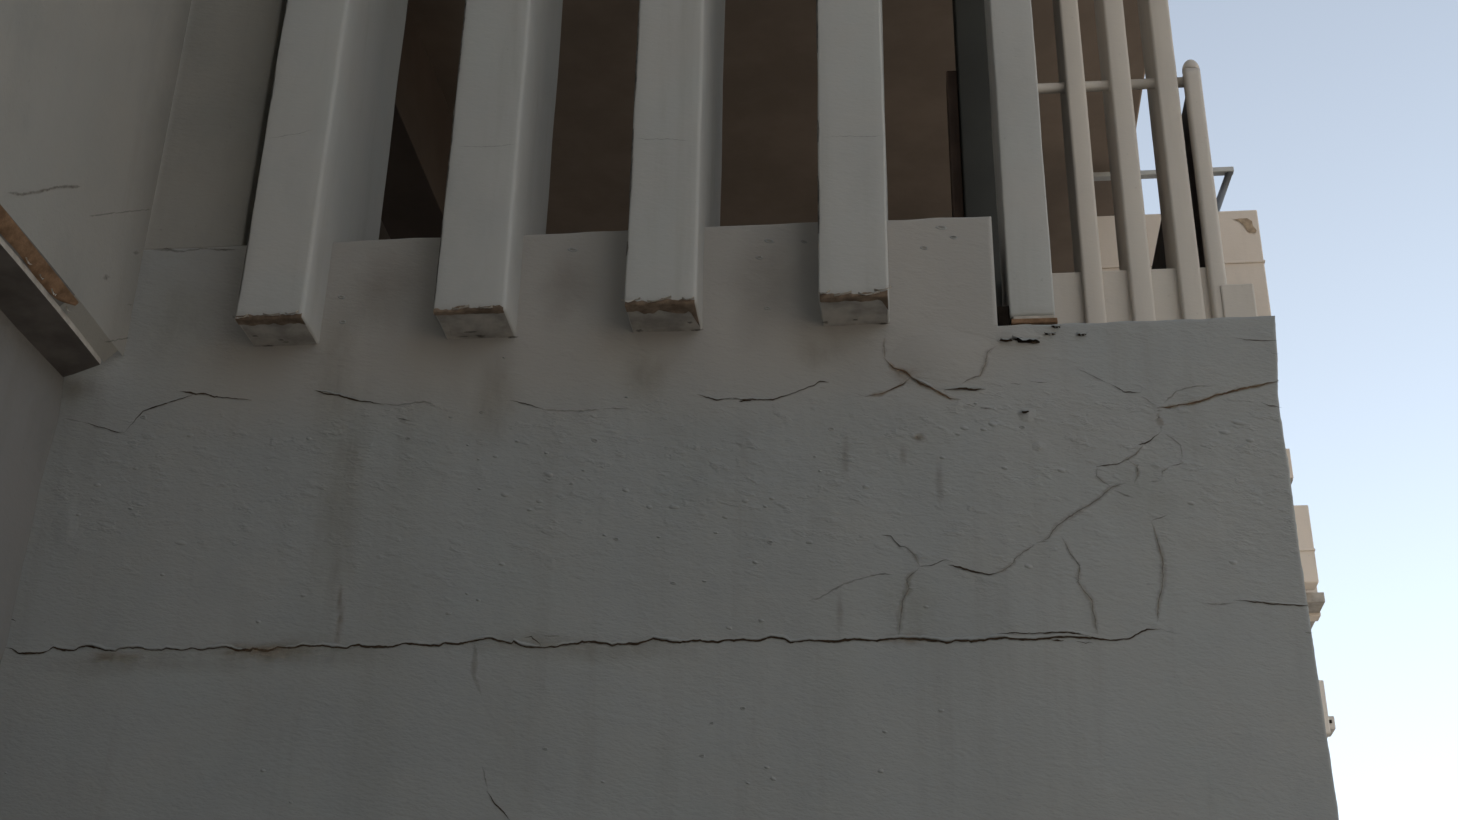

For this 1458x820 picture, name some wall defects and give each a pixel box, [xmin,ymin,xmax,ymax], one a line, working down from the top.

peeling [999,325,1061,344]
crack [866,351,1047,409]
crack [10,380,1282,654]
crack [1238,599,1308,633]